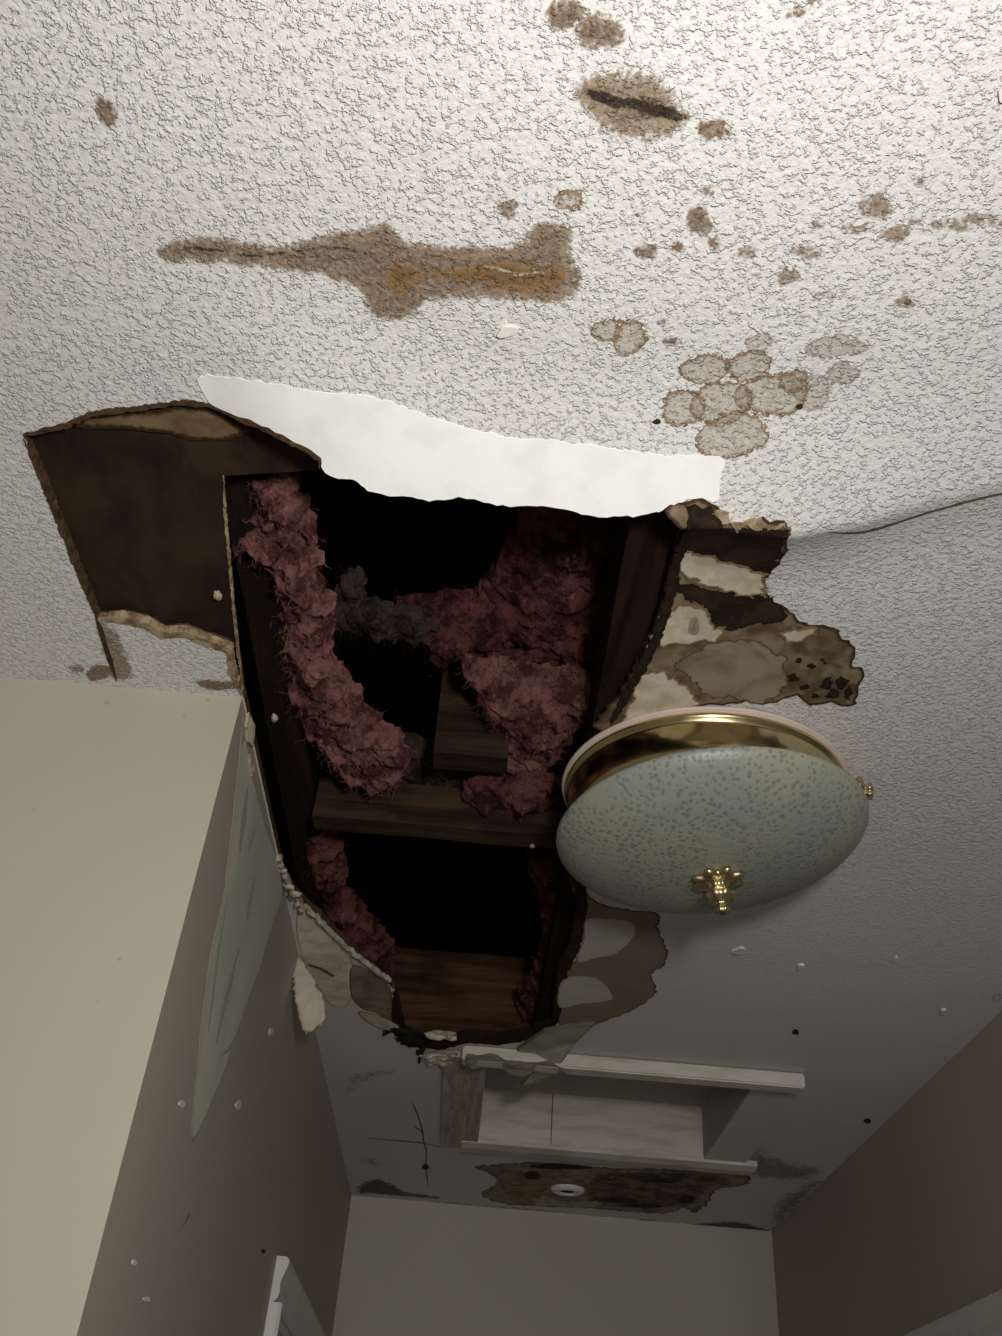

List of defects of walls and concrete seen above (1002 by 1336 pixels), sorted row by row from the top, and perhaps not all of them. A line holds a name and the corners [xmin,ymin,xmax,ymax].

damp [547,0,625,50]
damp [576,71,730,141]
damp [633,187,719,258]
damp [590,316,677,357]
damp [661,349,811,460]
peeling [674,551,769,599]
peeling [649,602,726,648]
peeling [779,626,818,645]
peeling [621,669,703,722]
peeling [178,712,400,1143]
peeling [517,879,669,1064]
damp [357,1147,828,1231]